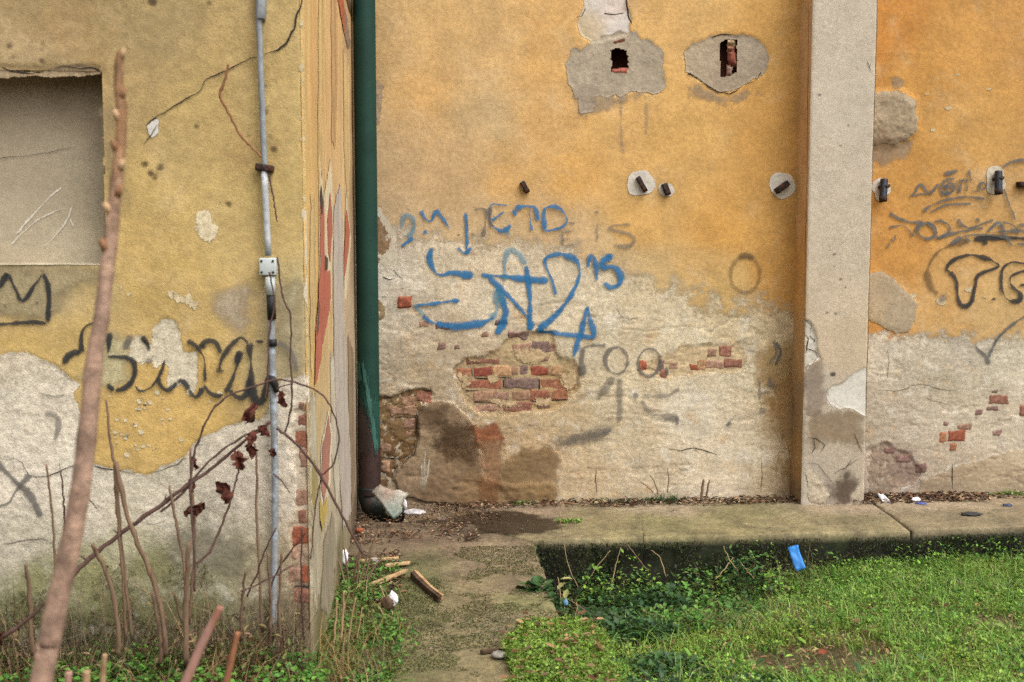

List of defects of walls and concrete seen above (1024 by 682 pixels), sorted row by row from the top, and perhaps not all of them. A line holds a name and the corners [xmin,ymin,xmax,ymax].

crack [143,0,303,145]
spalling [577,0,632,42]
spalling [610,48,629,72]
spalling [720,39,738,77]
peeling [0,352,80,671]
peeling [57,194,369,670]
leakage [421,407,478,486]
peeling [377,207,820,521]
peeling [825,329,1024,499]